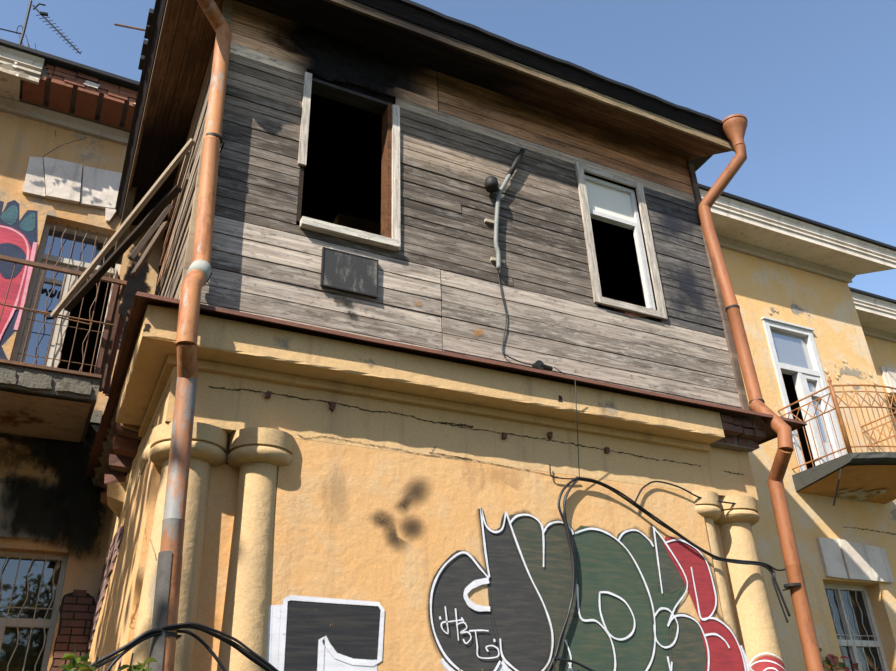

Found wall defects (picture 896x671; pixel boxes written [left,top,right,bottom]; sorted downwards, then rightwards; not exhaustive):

peeling [823,359,877,391]
crack [208,386,700,467]
crack [297,434,558,477]
damp [0,417,105,559]
damp [400,485,423,508]
damp [376,515,419,544]